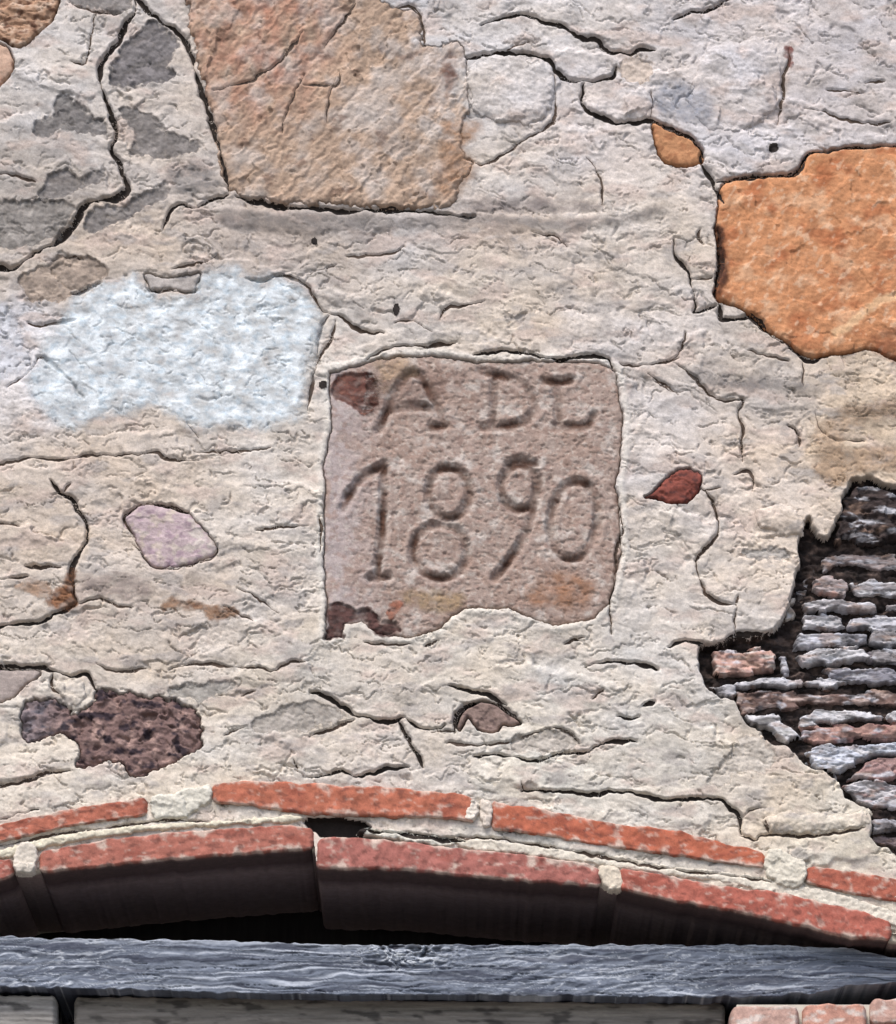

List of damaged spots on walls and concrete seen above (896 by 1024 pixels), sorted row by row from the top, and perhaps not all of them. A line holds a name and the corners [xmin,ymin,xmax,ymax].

crack [673,0,729,21]
crack [0,0,475,272]
crack [466,14,896,204]
crack [28,320,62,328]
crack [71,283,101,296]
crack [0,422,278,629]
crack [247,229,828,671]
spalling [698,480,896,856]
crack [294,685,865,842]